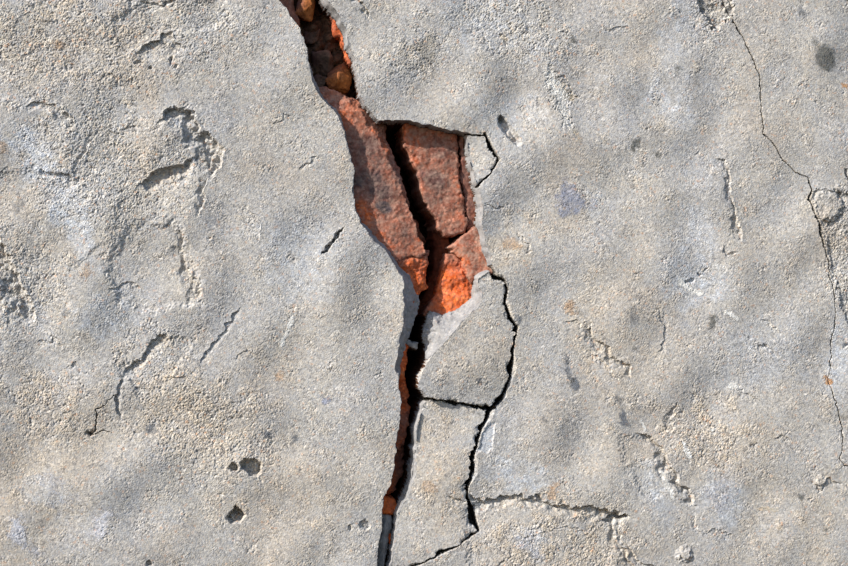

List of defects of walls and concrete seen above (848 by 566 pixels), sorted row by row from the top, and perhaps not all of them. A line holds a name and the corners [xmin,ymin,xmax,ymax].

crack [282,0,519,566]
peeling [477,422,497,454]
crack [721,0,847,466]